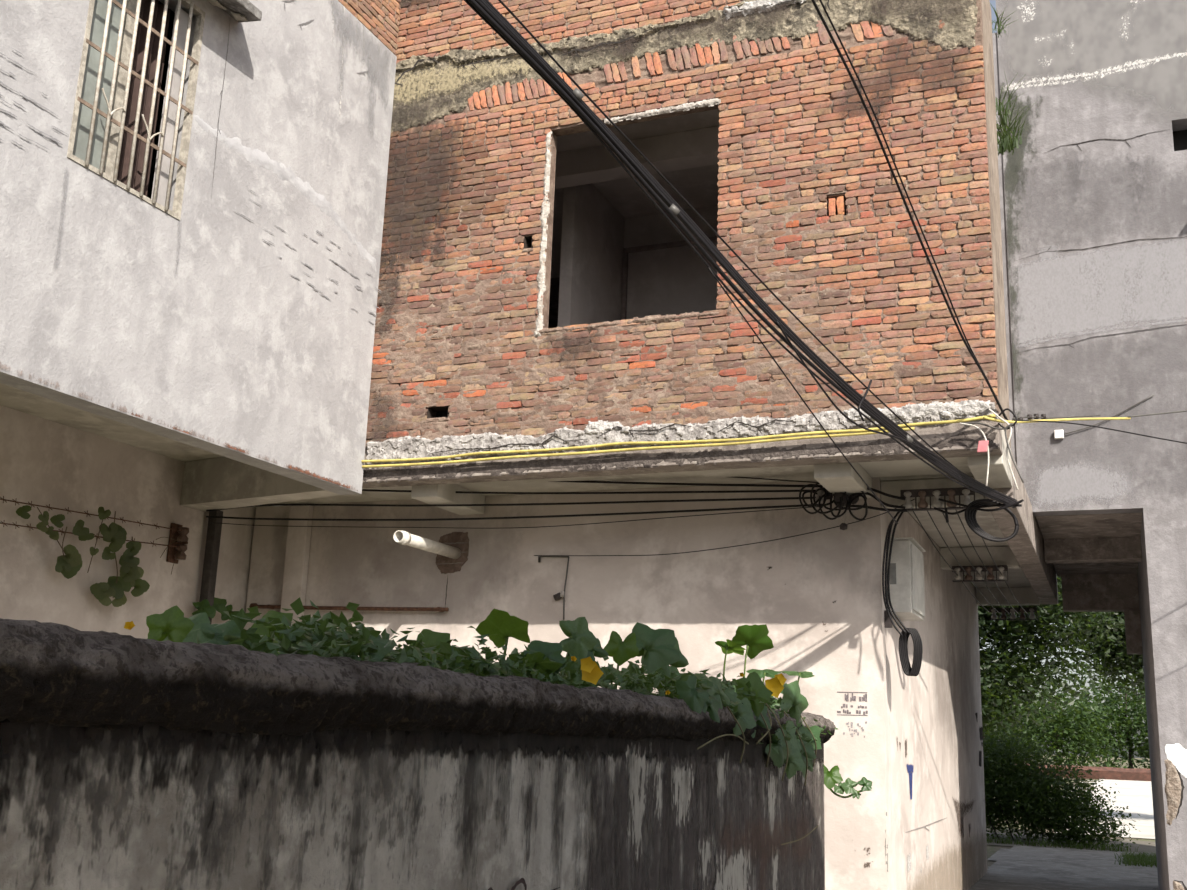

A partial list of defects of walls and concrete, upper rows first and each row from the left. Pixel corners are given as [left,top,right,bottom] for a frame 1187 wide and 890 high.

spalling [723,0,806,20]
crack [1050,129,1170,151]
crack [1016,236,1187,261]
spalling [584,420,630,435]
flaking render [436,532,469,574]
flaking render [1164,743,1187,825]
damp [0,718,825,890]